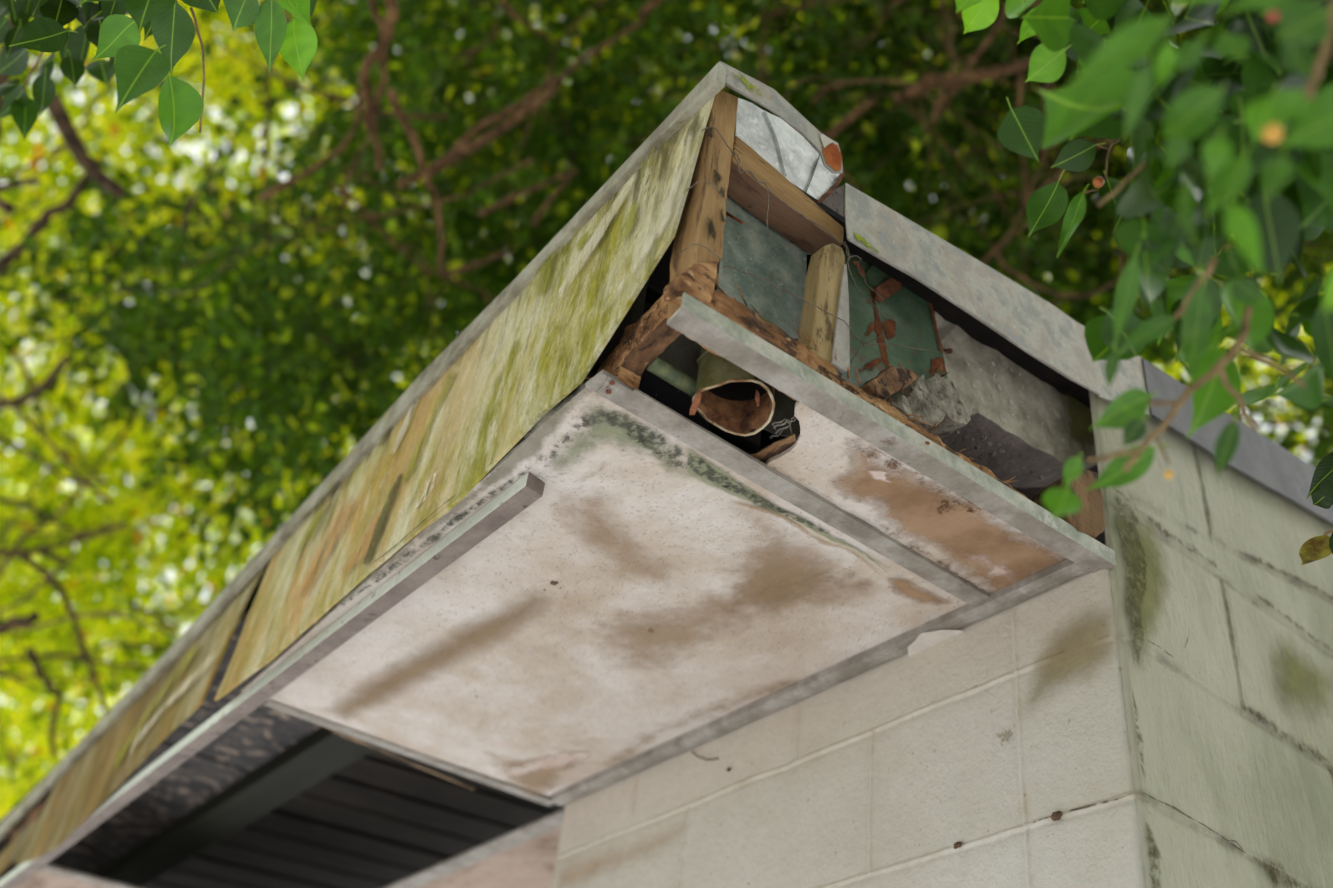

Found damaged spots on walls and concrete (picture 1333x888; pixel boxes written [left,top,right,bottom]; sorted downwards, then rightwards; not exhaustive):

leakage [550,117,713,312]
leakage [708,170,725,239]
rust [859,286,896,372]
rust [929,302,946,373]
leakage [379,398,419,453]
leakage [342,469,529,605]
leakage [550,410,880,577]
leakage [746,545,819,605]
leakage [892,579,942,604]
leakage [840,448,1064,591]
leakage [341,608,527,713]
peeling [907,630,964,656]